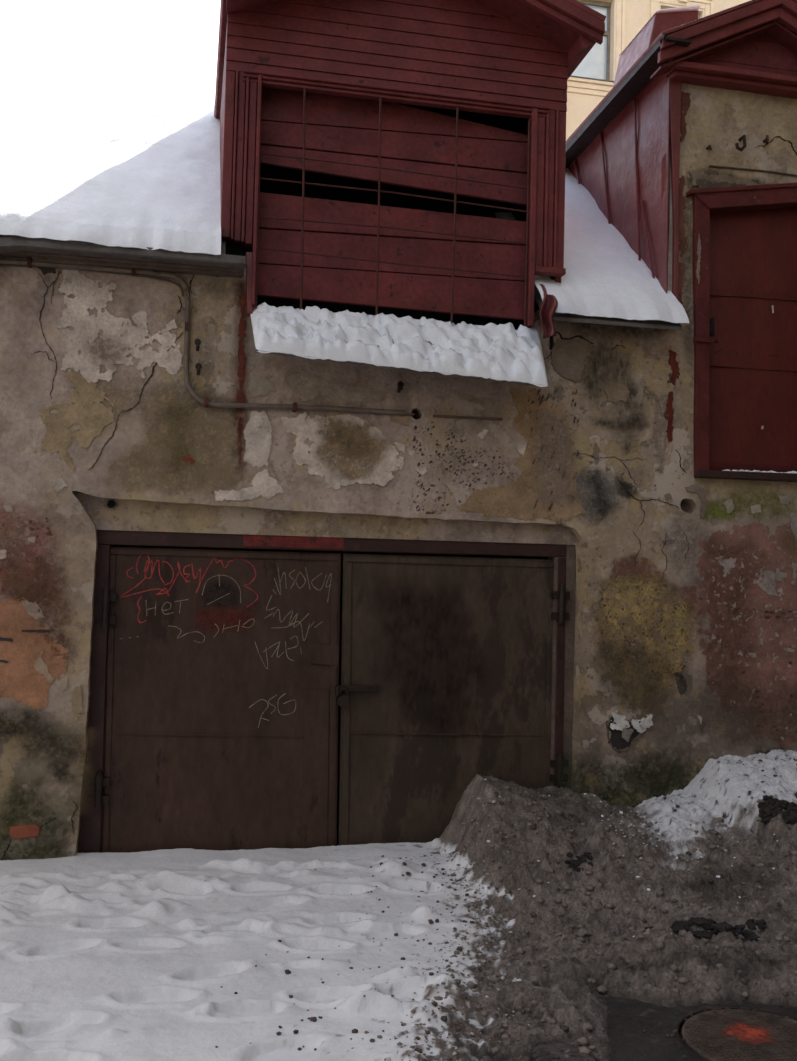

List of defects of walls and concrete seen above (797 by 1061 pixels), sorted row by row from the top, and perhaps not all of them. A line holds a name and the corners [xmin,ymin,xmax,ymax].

crack [34,269,62,394]
peeling [33,267,183,470]
crack [88,363,157,470]
damp [569,470,635,521]
crack [572,453,689,575]
peeling [0,504,84,721]
peeling [606,495,797,753]
mould [0,711,88,781]